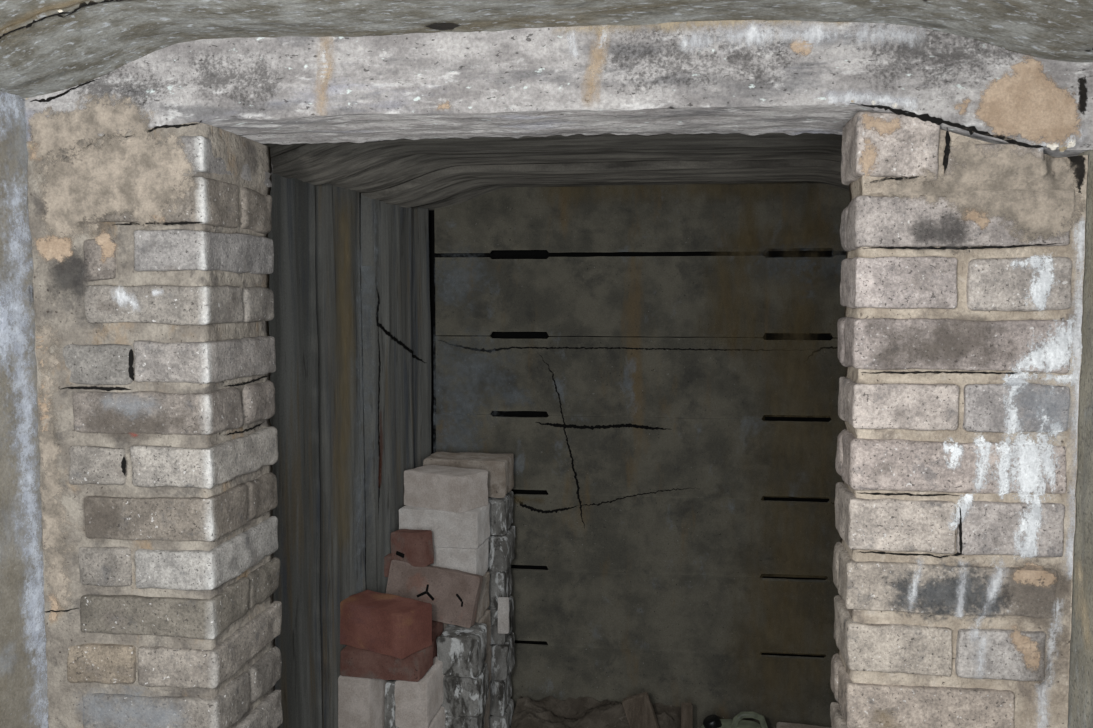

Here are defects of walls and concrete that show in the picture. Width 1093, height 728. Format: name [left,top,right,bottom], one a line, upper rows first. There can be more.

crack [0,0,125,39]
crack [1,79,99,102]
crack [850,103,1059,184]
flaking render [828,55,1088,243]
crack [62,349,134,391]
crack [375,277,838,529]
leakage [0,185,48,728]
crack [119,457,127,475]
leakage [943,221,1085,728]
crack [860,492,962,558]